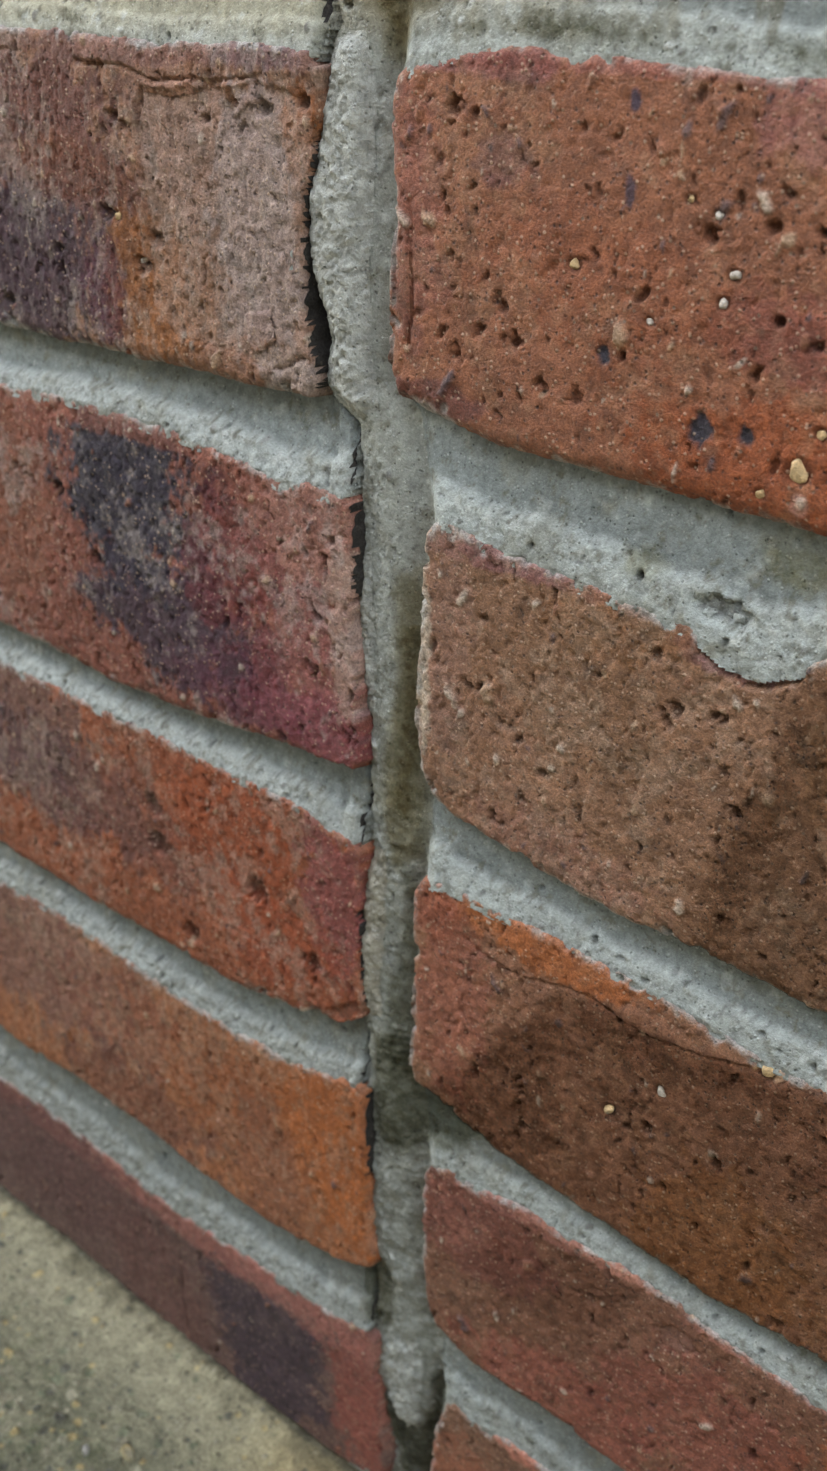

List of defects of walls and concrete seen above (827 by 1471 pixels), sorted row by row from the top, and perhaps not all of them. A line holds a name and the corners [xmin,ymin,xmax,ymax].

crack [322,0,334,23]
crack [76,60,104,68]
crack [300,141,332,388]
crack [406,251,414,346]
crack [349,433,366,598]
spalling [695,595,754,630]
spalling [708,656,802,689]
crack [360,783,375,845]
crack [356,910,368,1003]
crack [361,1042,377,1176]
crack [371,1269,380,1321]